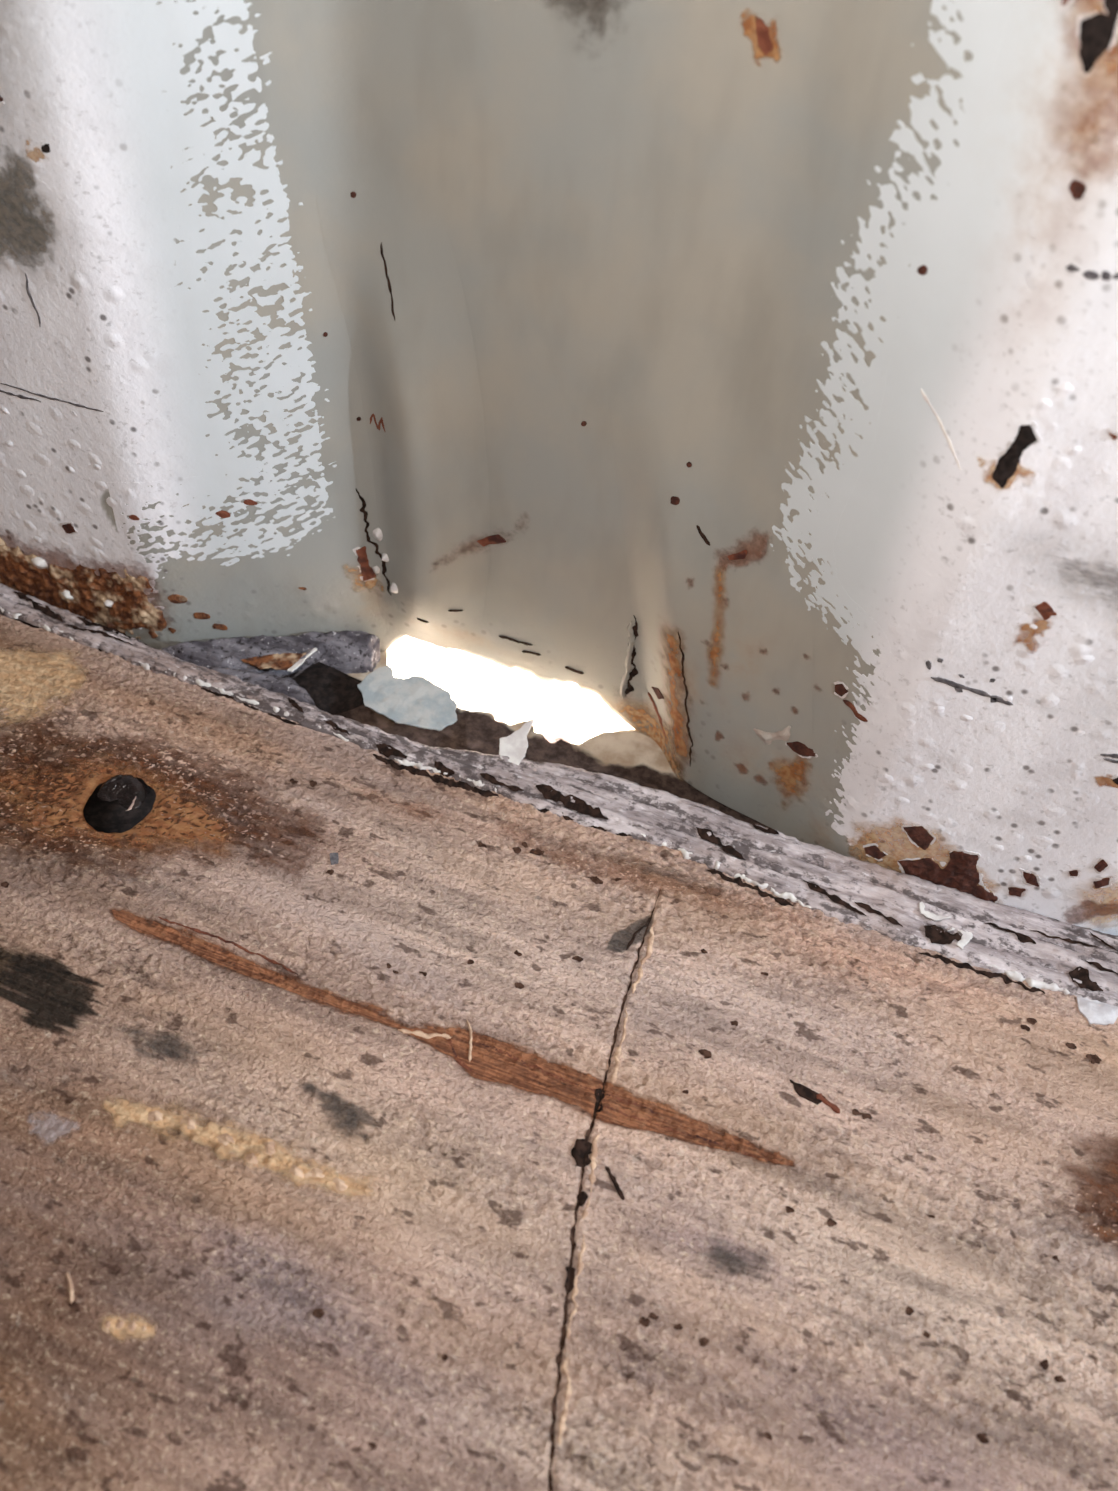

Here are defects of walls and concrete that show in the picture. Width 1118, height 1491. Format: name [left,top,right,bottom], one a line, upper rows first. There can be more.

corrosion [741,13,780,65]
corrosion [1057,0,1118,200]
peeling [107,0,337,609]
peeling [770,0,1015,846]
corrosion [60,522,77,534]
corrosion [0,535,228,639]
corrosion [709,536,766,685]
corrosion [0,720,316,872]
corrosion [621,687,680,777]
corrosion [851,823,1041,903]
water stain [0,948,102,1031]
crack [548,889,661,1491]